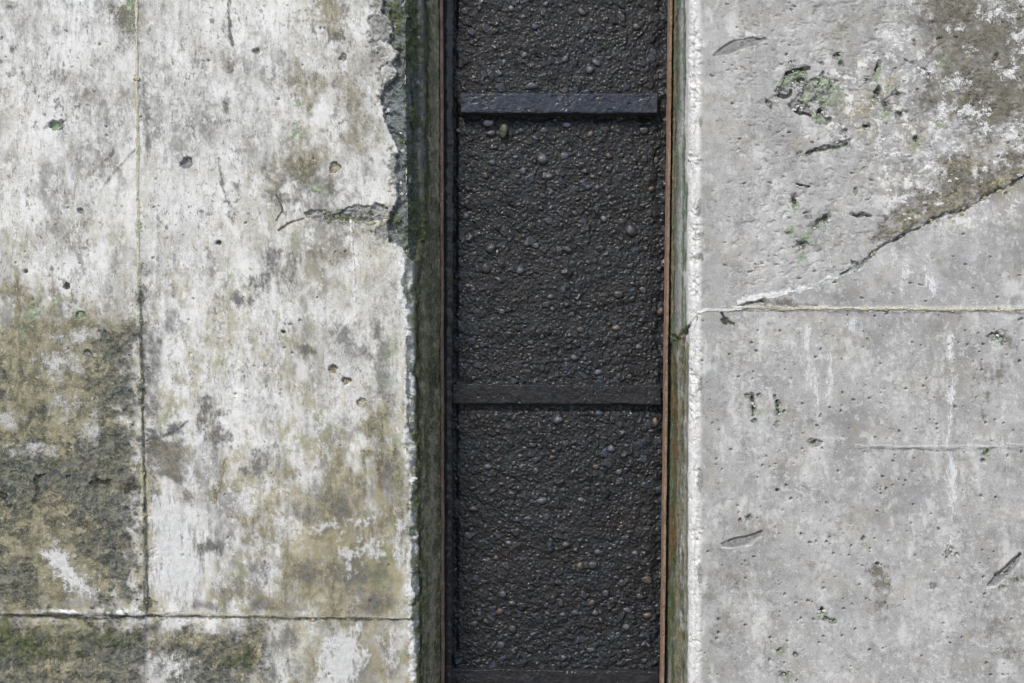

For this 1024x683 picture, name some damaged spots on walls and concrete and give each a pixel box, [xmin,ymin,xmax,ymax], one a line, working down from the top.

water stain [0,265,192,615]
water stain [191,0,441,683]
spalling [276,0,424,683]
crack [674,166,1024,361]
water stain [873,0,1024,304]